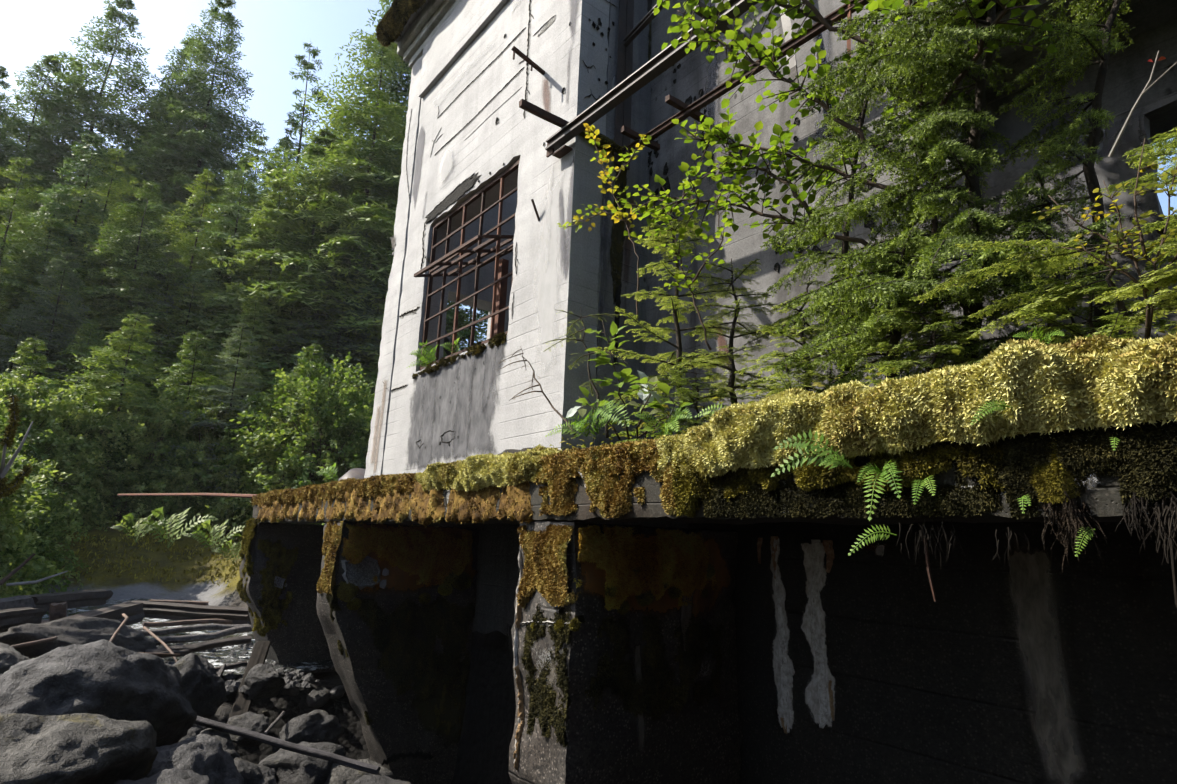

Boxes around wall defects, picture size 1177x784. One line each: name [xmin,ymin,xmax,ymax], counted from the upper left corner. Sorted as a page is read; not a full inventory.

water stain [407,343,504,469]
spalling [341,556,389,600]
water stain [757,536,836,734]